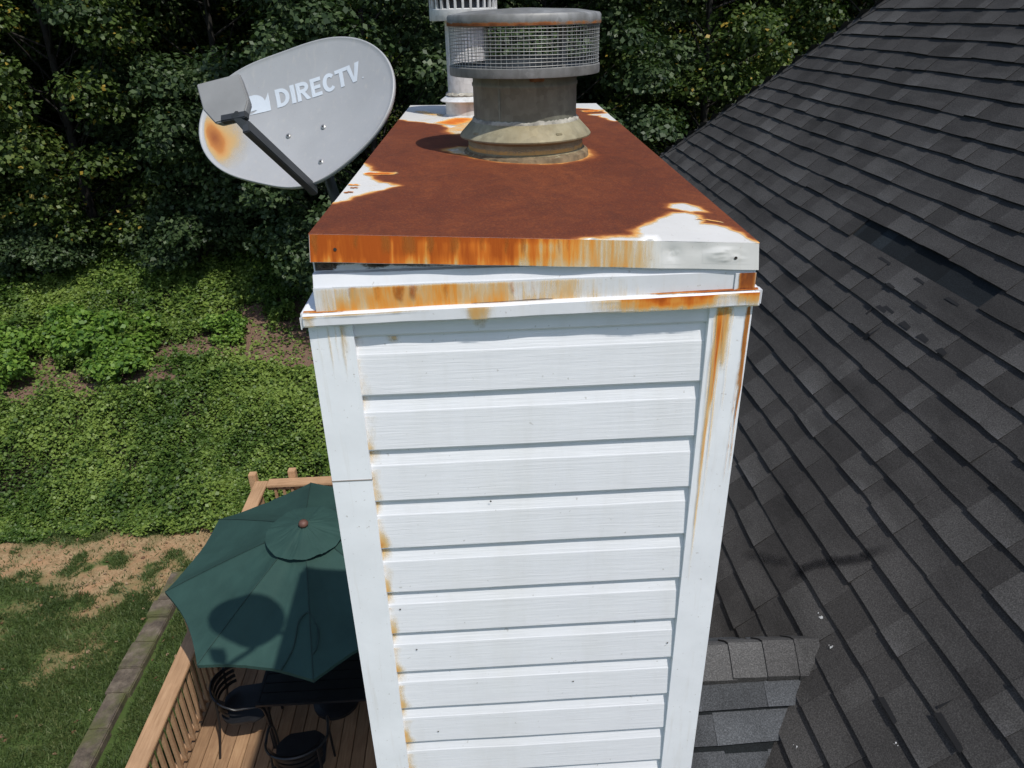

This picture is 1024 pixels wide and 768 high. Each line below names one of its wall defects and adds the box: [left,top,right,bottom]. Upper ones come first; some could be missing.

rust [308,108,760,268]
rust [302,280,577,320]
rust [602,273,760,529]